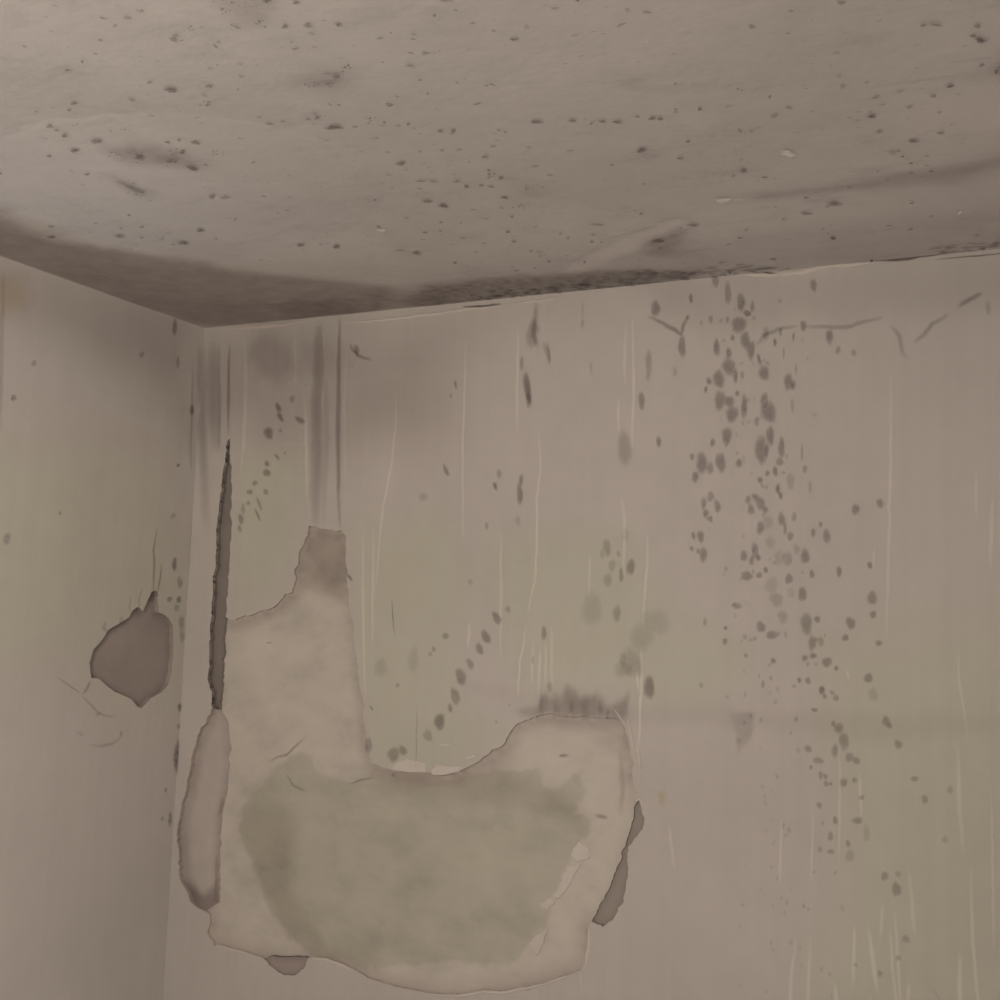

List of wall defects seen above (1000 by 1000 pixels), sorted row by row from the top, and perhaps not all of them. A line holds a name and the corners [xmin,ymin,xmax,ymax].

flaking render [89,591,174,708]
crack [208,442,232,709]
flaking render [176,439,645,997]